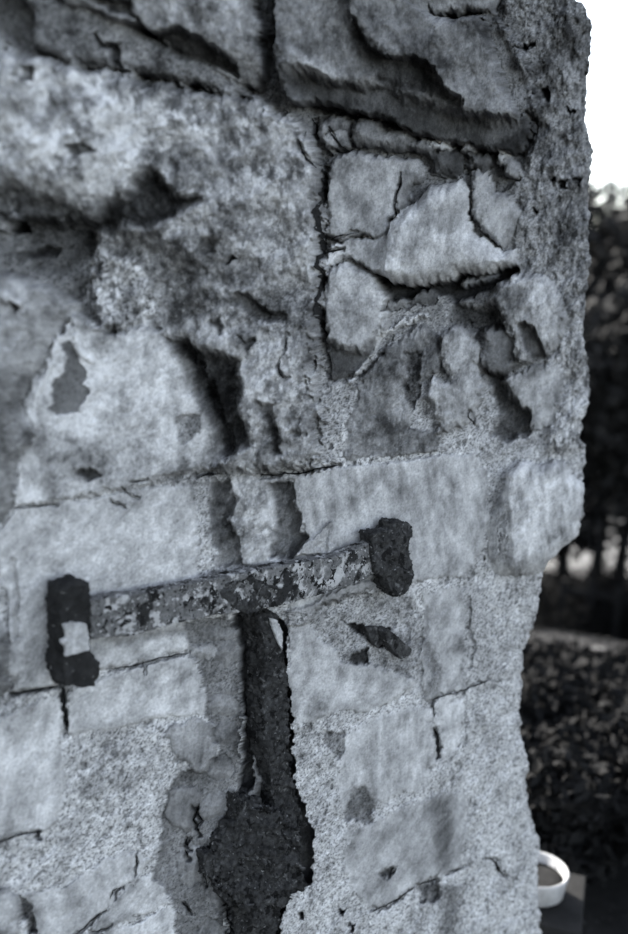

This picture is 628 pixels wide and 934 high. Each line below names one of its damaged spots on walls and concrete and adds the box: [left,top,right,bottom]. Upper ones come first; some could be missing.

rust [196,846,237,934]
rust [271,896,293,919]
crack [371,868,463,913]